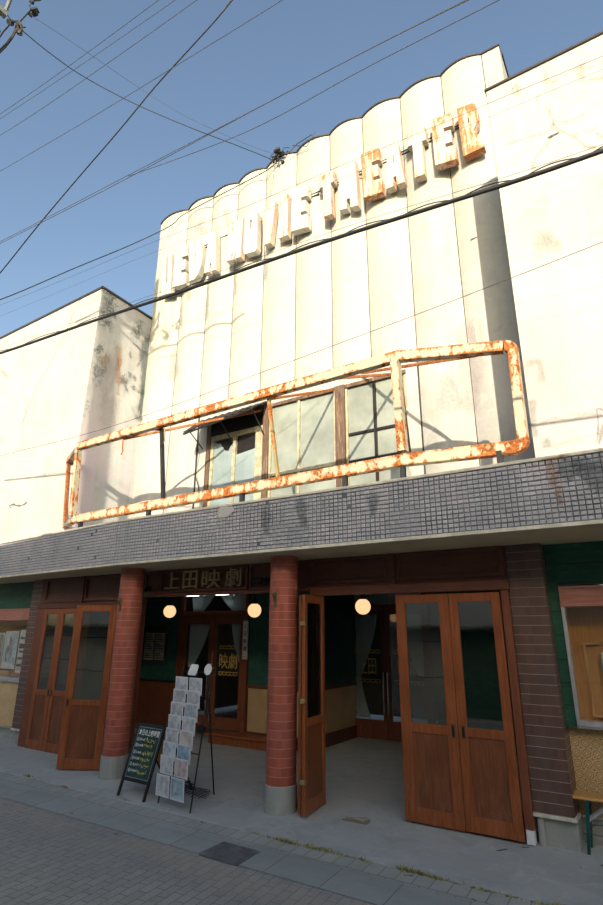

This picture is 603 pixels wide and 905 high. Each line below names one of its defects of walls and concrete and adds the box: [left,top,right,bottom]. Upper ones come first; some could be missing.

water stain [138,337,150,416]